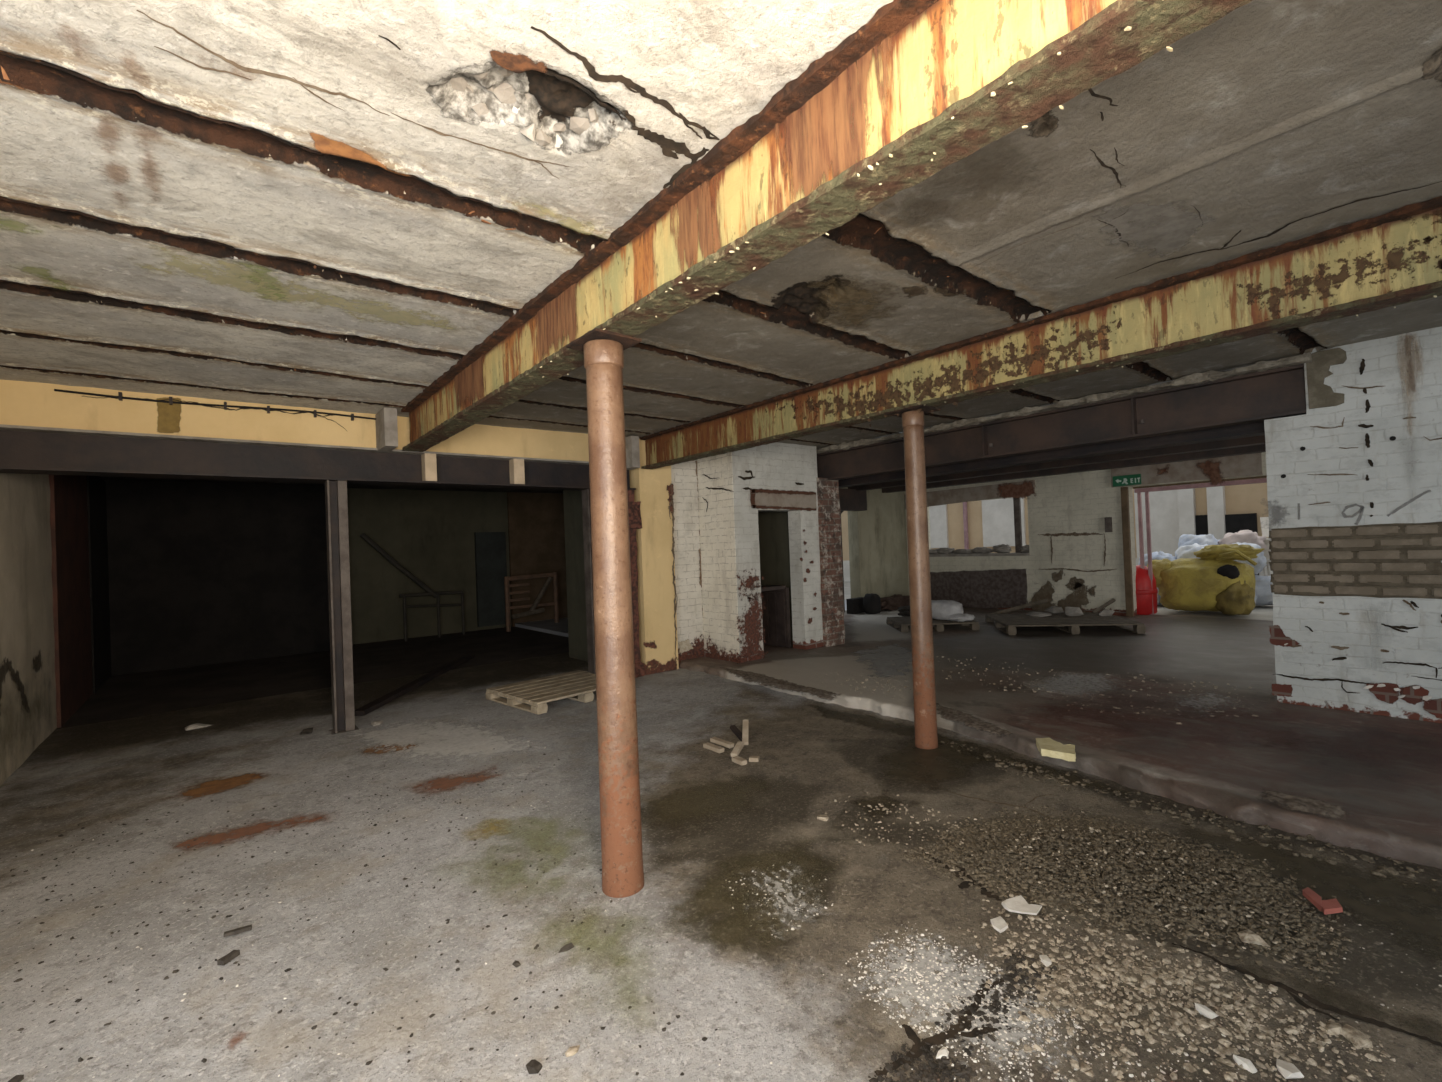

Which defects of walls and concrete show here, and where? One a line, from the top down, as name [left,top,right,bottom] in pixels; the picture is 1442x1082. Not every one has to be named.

crack [136,10,570,179]
spalling [426,49,632,155]
crack [531,26,720,189]
rust [775,37,891,198]
crack [960,88,1442,279]
leakage [771,274,966,327]
rust [623,213,1122,434]
rust [1236,208,1442,355]
peeling [635,569,840,701]
peeling [1363,683,1442,719]
leakage [675,849,832,946]
leakage [864,935,1053,1063]